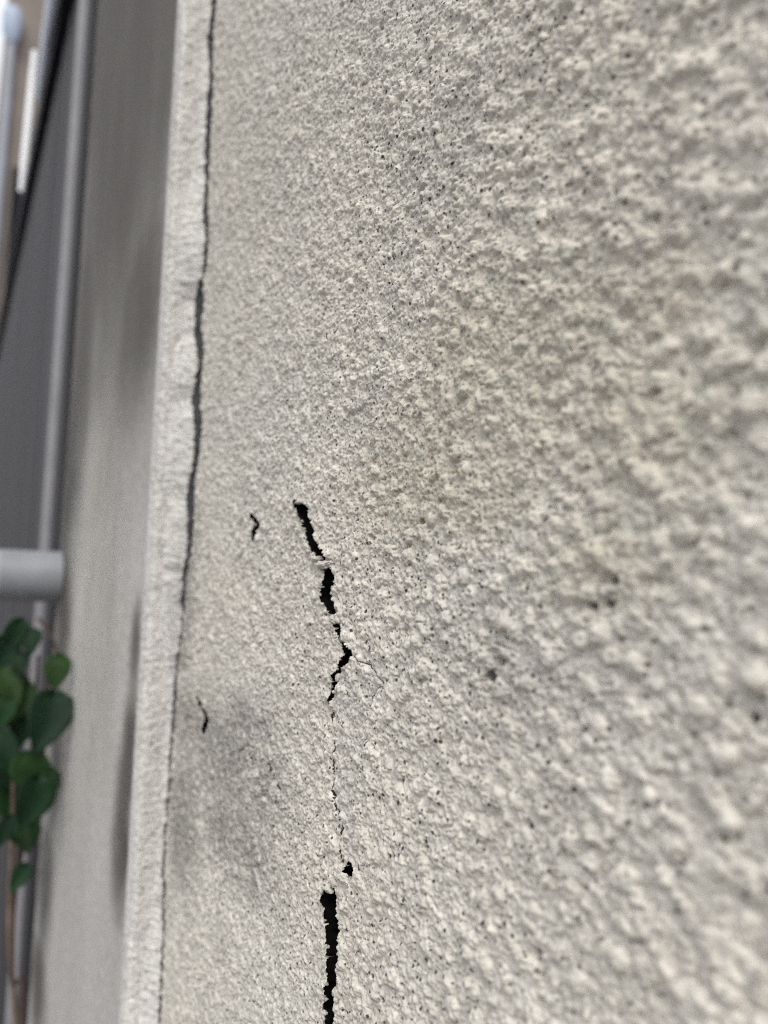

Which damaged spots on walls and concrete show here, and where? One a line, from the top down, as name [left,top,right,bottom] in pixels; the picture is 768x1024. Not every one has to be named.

crack [158,0,281,1024]
crack [292,500,384,1024]